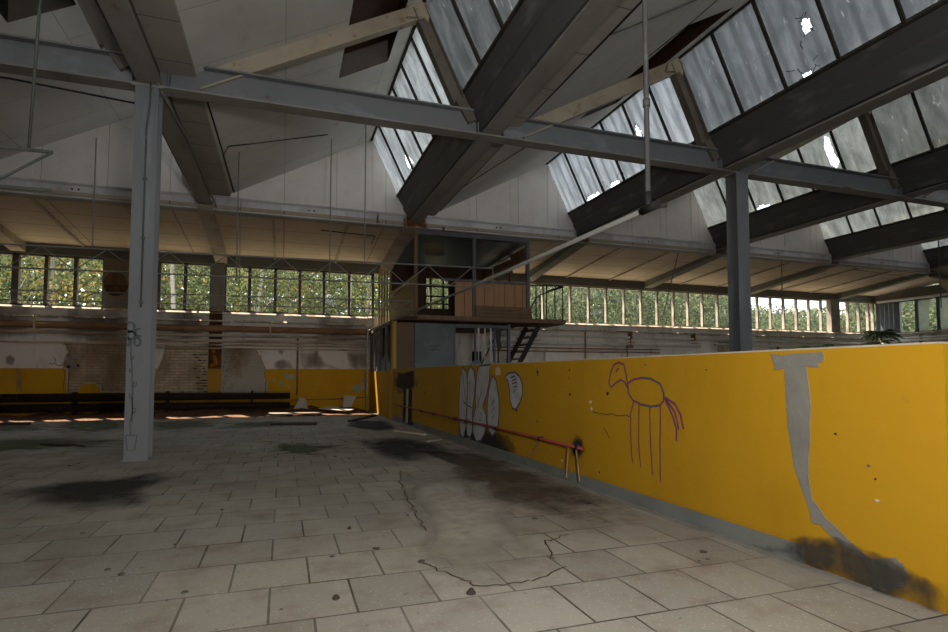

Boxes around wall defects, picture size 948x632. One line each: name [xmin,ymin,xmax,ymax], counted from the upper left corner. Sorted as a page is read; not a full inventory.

damp [32,475,157,503]
crack [399,471,427,531]
crack [420,534,568,586]
damp [791,539,933,609]